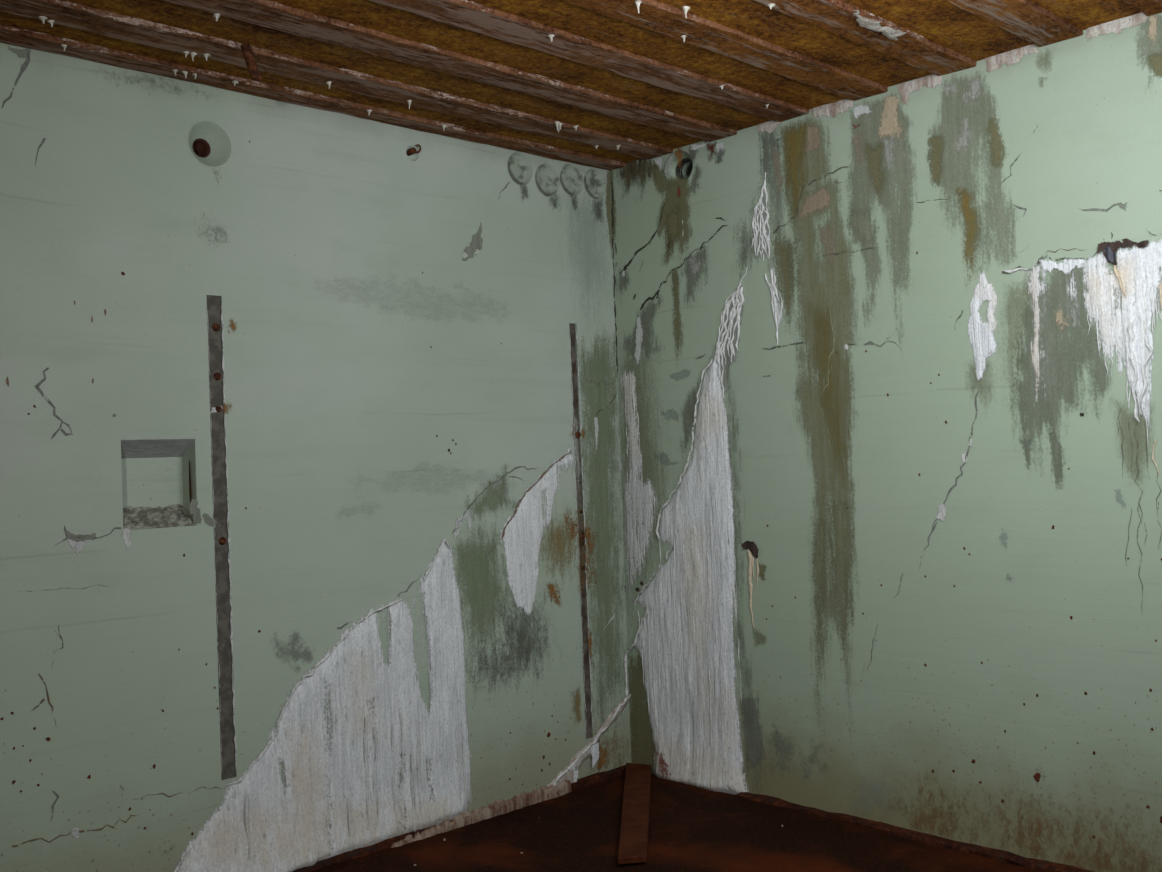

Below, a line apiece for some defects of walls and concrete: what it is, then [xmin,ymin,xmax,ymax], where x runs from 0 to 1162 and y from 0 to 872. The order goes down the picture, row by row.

water stain [55,0,270,52]
spalling [1097,238,1149,265]
crack [583,181,728,449]
peeling [190,499,217,528]
water stain [174,44,1039,872]
crack [894,391,979,598]
corrosion [543,516,596,605]
crack [12,785,221,847]